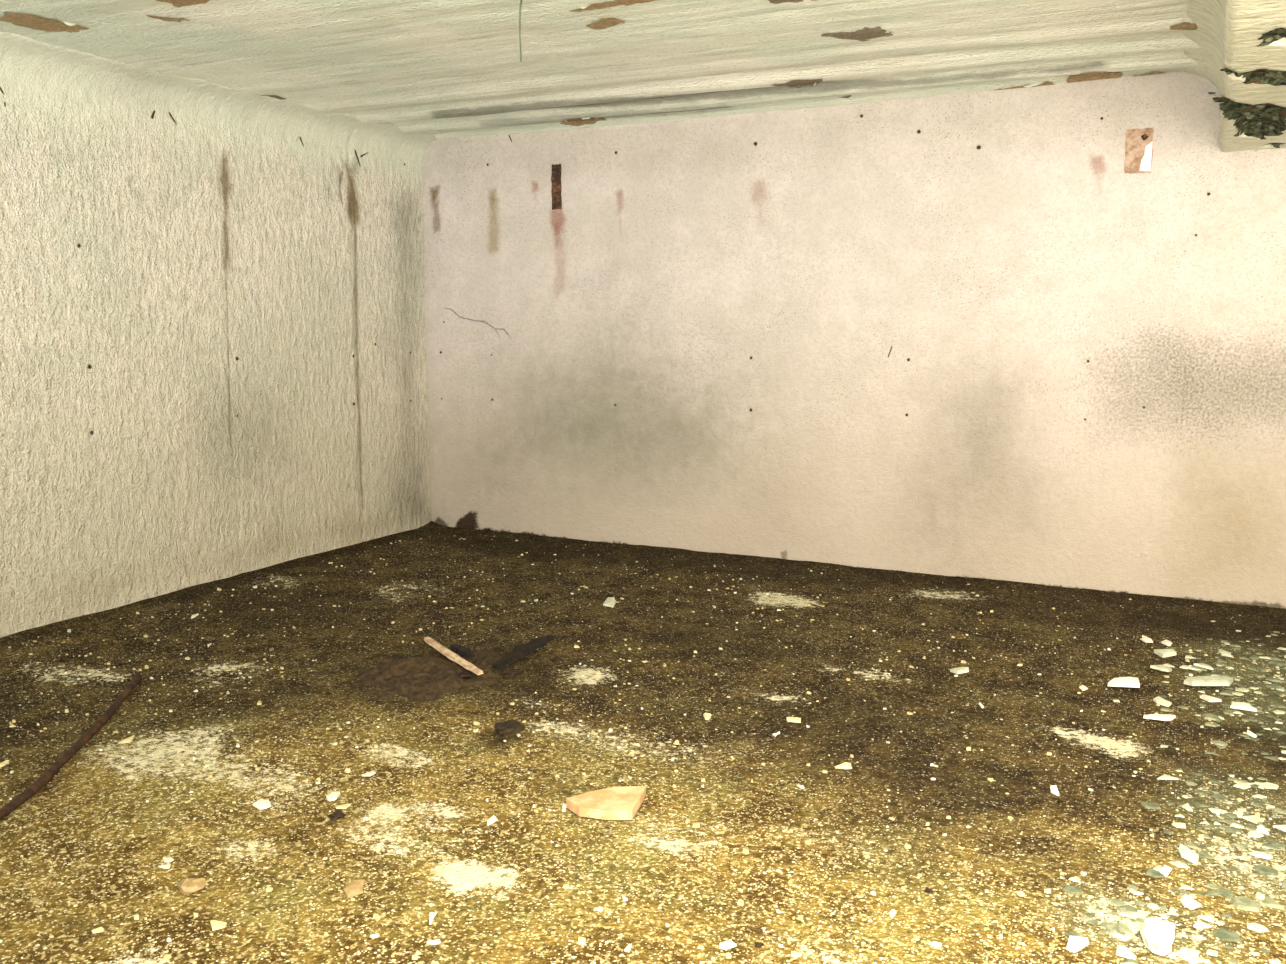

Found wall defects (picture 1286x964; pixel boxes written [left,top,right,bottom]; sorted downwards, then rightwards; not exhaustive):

peeling [0,13,89,33]
peeling [146,0,210,22]
peeling [569,0,655,29]
spalling [1220,68,1286,86]
spalling [1208,92,1286,148]
crack [446,308,512,340]